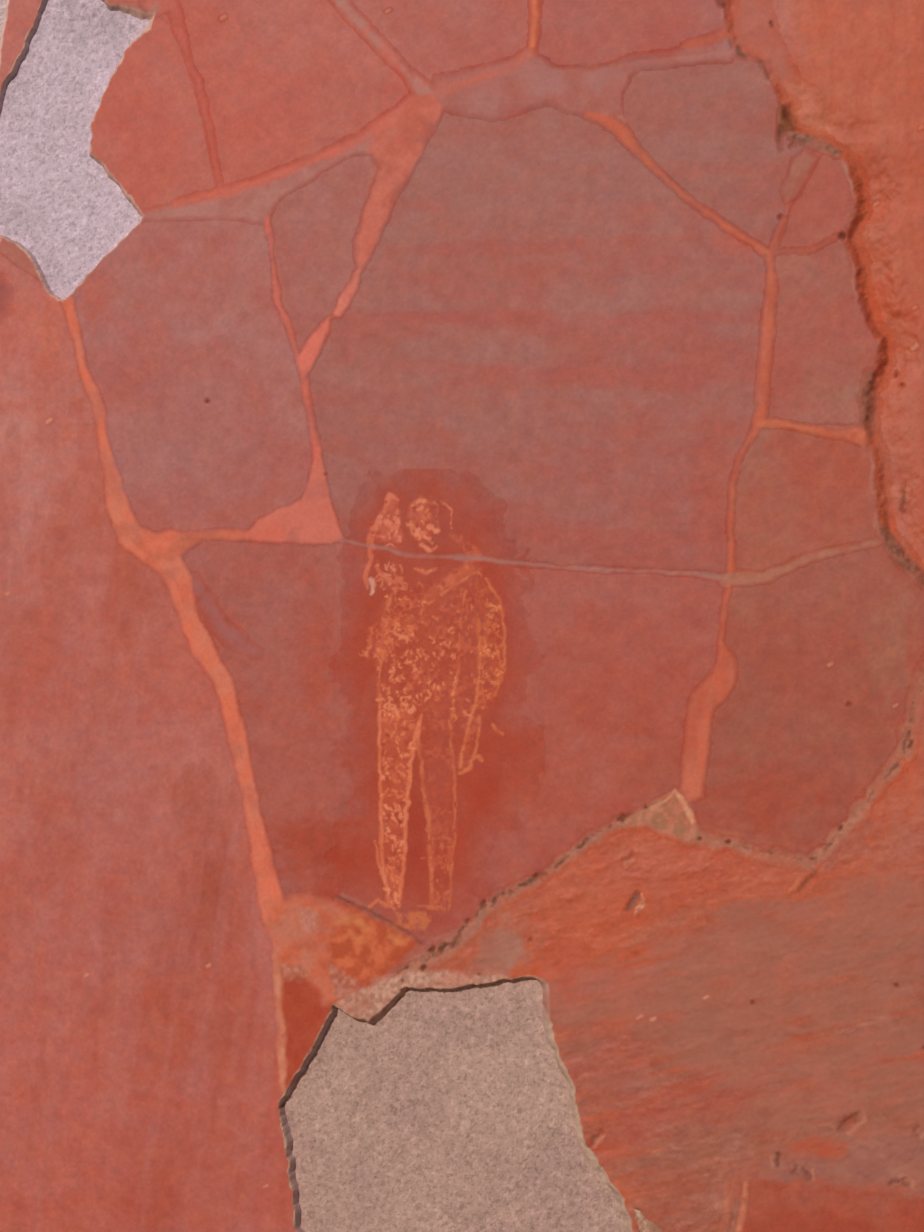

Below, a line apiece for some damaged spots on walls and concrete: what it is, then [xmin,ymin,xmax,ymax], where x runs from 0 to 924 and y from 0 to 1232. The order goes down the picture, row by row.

spalling [0,0,154,300]
crack [526,0,544,51]
crack [714,0,729,10]
crack [727,42,773,81]
crack [60,0,446,1096]
crack [333,83,924,1027]
spalling [621,890,647,917]
spalling [278,900,664,1232]